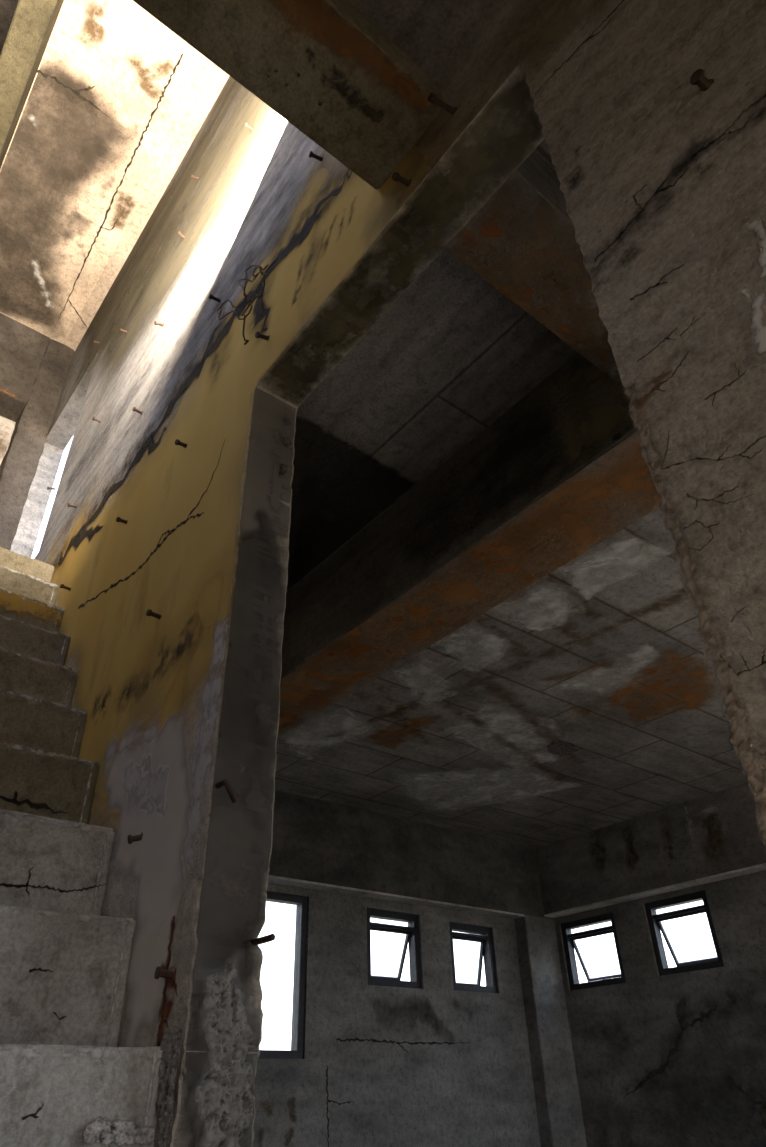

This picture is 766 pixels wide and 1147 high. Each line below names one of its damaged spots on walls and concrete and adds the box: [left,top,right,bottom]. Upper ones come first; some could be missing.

damp [83,5,104,42]
damp [129,60,174,98]
damp [0,71,126,326]
crack [58,172,352,565]
crack [78,441,225,609]
crack [0,791,66,814]
crack [0,864,107,896]
damp [180,511,685,1147]
spalling [724,700,766,840]
spalling [82,1029,186,1147]
corrosion [156,920,176,1046]
spalling [193,959,256,1147]